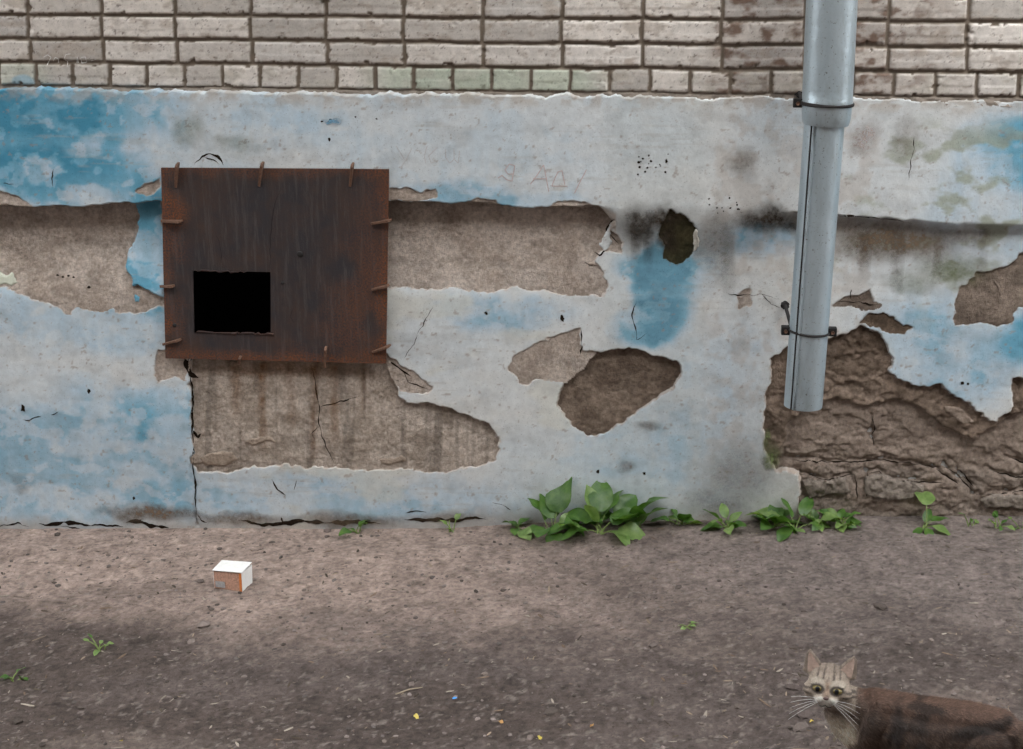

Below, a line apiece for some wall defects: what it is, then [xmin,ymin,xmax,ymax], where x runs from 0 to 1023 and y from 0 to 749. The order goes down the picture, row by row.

spalling [0,180,164,315]
spalling [388,188,622,297]
peeling [953,253,1023,327]
spalling [155,350,499,473]
spalling [508,315,681,436]
spalling [763,291,1023,517]